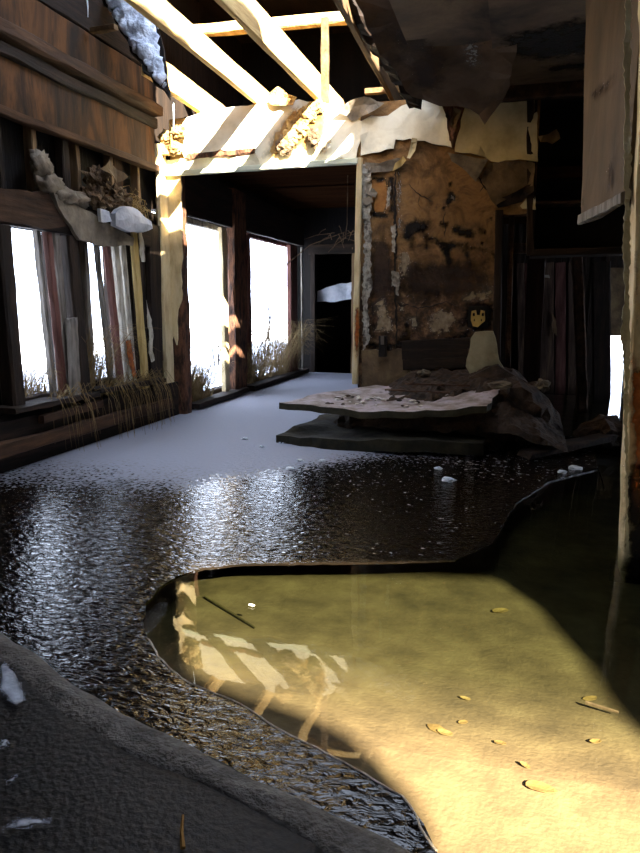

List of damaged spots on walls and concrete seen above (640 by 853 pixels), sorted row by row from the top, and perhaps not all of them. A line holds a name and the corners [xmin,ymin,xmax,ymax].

peeling [442,106,536,210]
leakage [369,219,495,351]